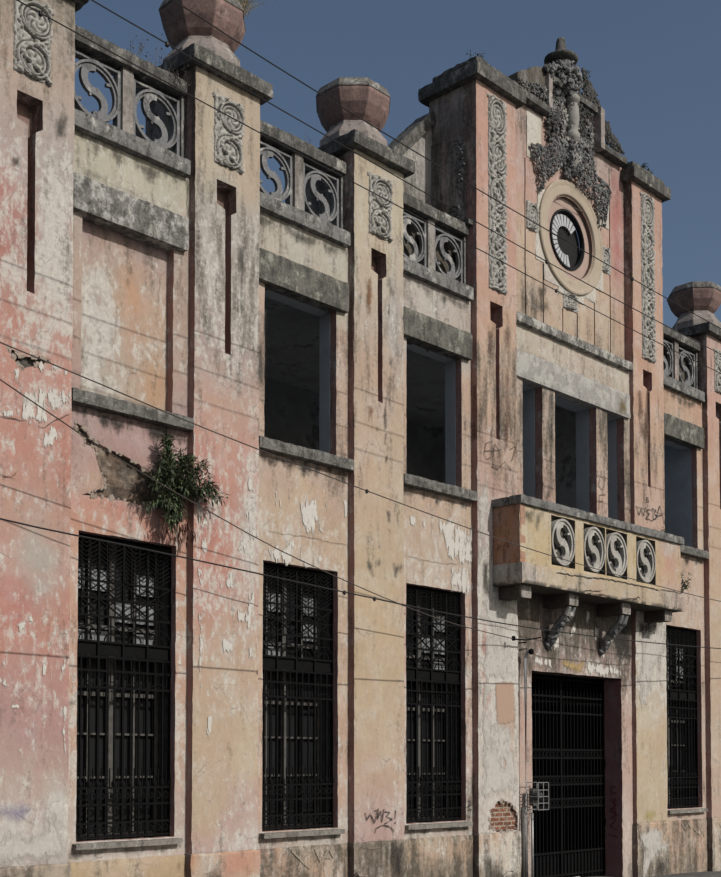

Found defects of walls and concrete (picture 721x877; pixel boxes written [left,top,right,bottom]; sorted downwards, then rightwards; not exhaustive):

flaking render [6,345,67,381]
peeling [2,387,71,447]
flaking render [73,420,183,524]
peeling [269,540,307,567]
peeling [300,498,327,535]
peeling [436,485,488,595]
peeling [238,577,256,628]
peeling [479,597,518,833]